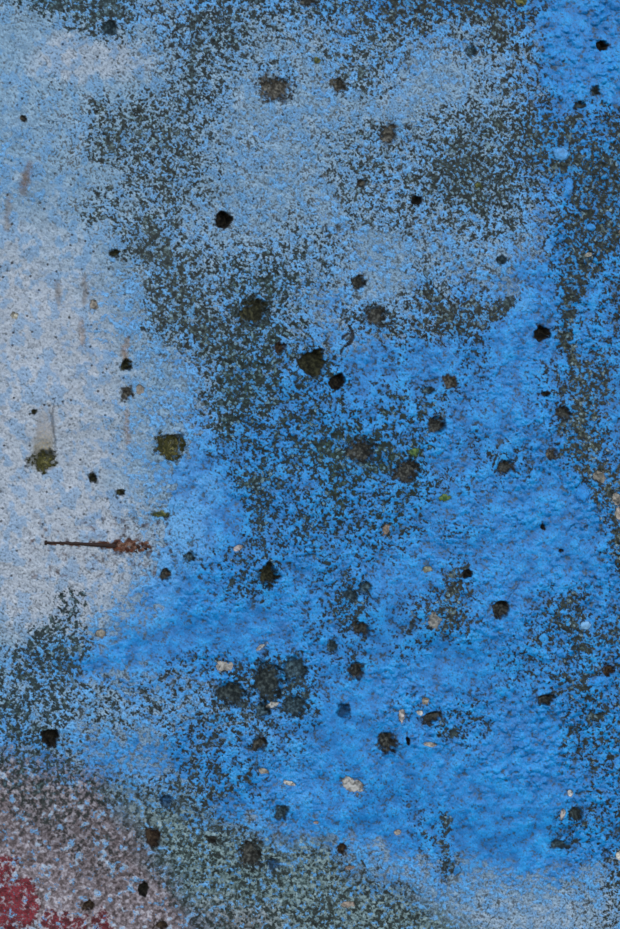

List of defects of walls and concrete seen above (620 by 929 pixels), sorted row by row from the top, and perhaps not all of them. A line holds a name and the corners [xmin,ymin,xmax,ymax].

corrosion [50,538,152,553]